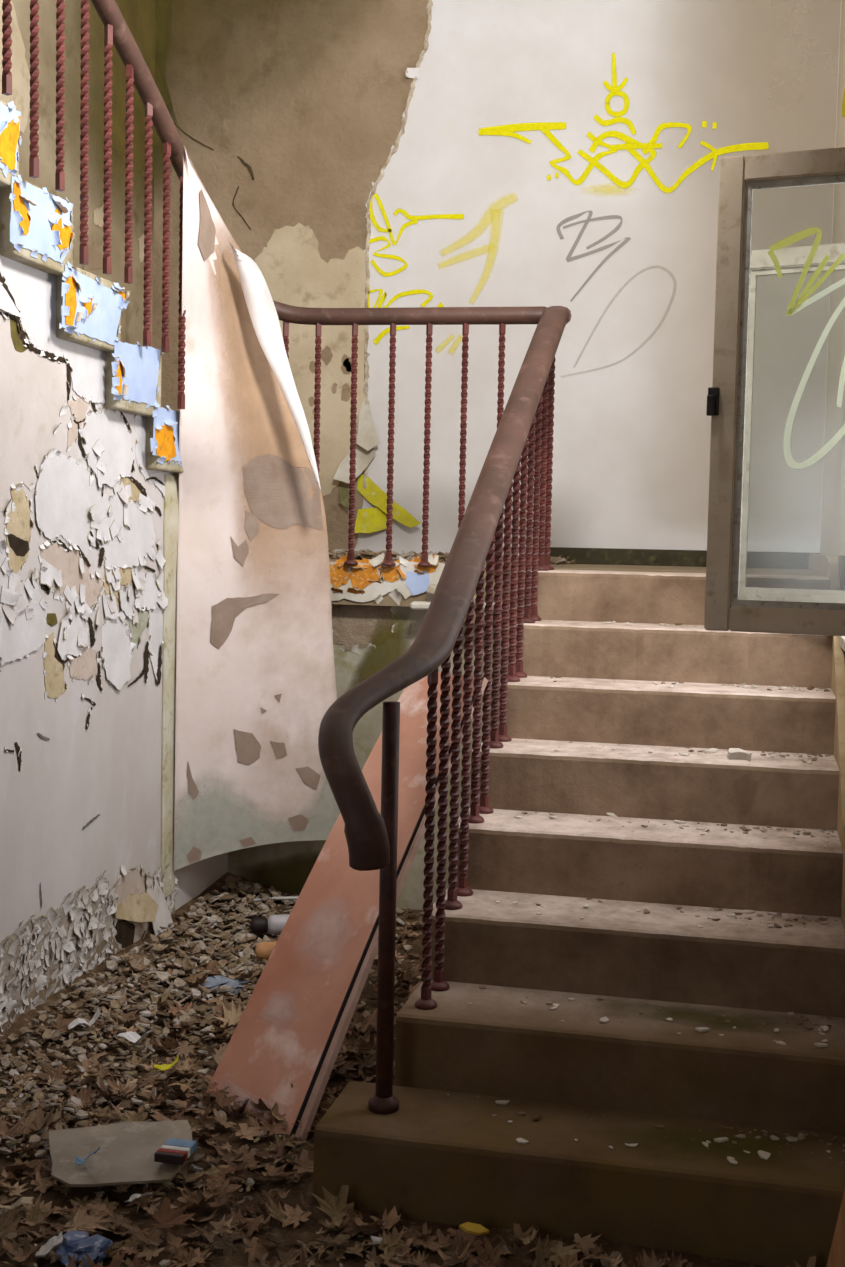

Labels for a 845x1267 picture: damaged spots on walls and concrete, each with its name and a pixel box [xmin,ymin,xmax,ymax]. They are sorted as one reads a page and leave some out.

peeling [0,0,445,1037]